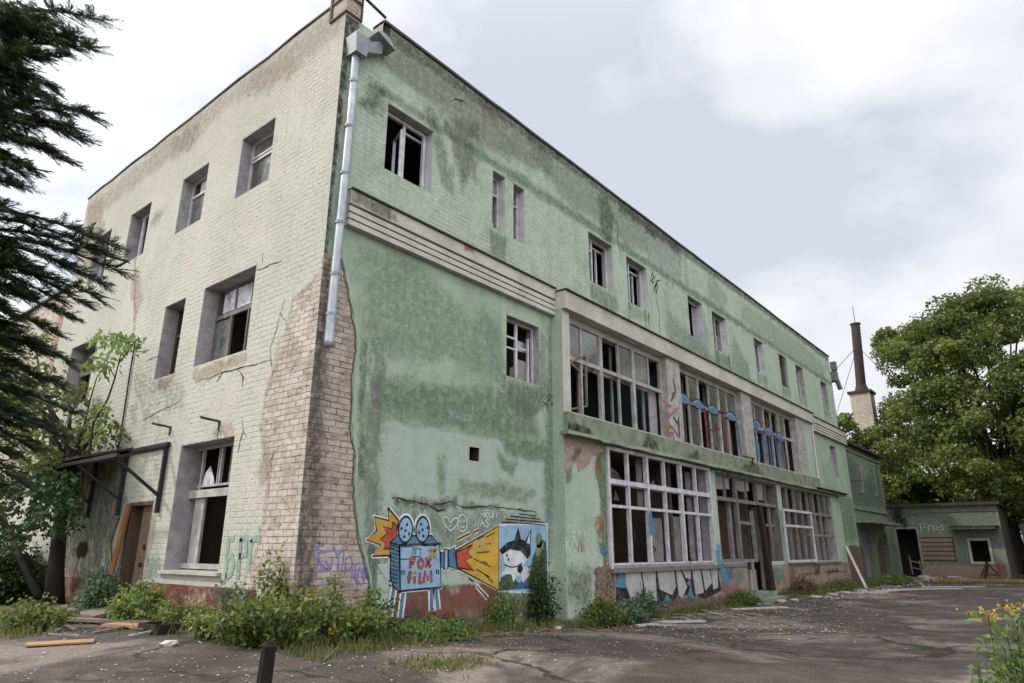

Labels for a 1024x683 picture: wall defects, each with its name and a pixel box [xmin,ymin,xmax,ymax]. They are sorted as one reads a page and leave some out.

leakage [380,33,828,382]
crack [142,299,286,421]
flaking render [244,252,373,616]
leakage [359,332,553,611]
crack [392,497,535,512]
flaking render [564,436,604,482]